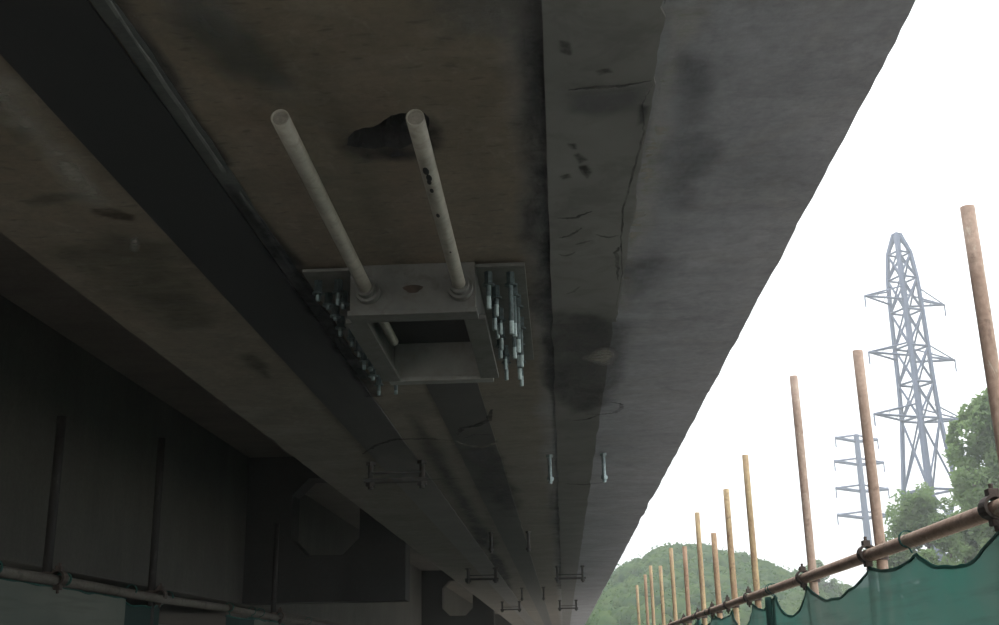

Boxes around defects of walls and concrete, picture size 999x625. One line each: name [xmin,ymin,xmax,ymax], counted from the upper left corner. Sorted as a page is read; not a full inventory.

spalling [347,113,416,159]
spalling [424,113,437,147]
damp [524,28,546,136]
damp [525,157,553,322]